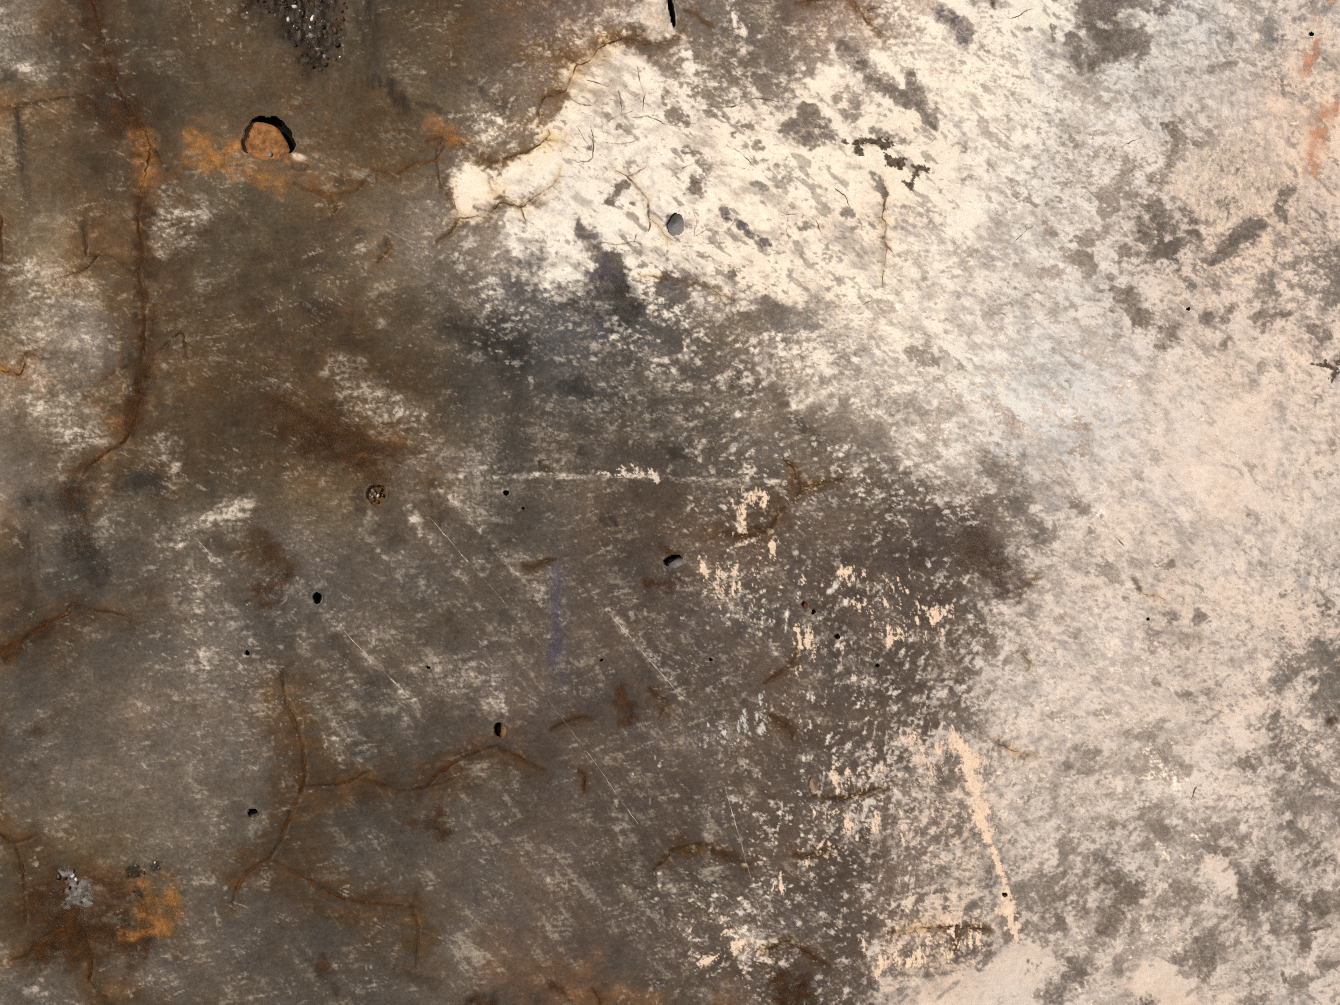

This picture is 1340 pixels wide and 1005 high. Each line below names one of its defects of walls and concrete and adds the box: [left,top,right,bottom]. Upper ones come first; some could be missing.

crack [62,0,187,464]
corrosion [186,129,241,172]
crack [426,136,540,234]
crack [506,37,695,279]
crack [835,188,892,304]
crack [279,708,306,841]
crack [298,874,373,905]